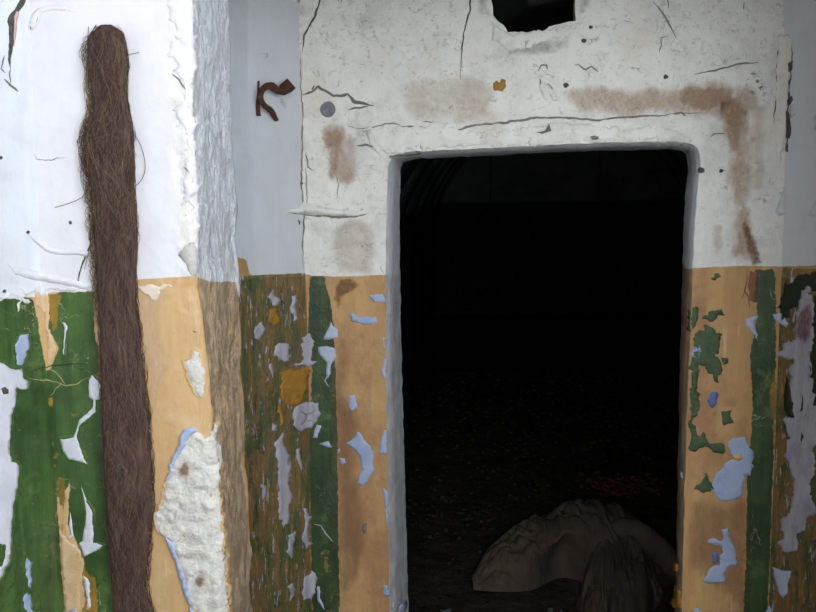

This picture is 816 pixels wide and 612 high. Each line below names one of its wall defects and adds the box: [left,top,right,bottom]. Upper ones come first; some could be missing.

crack [460,0,471,79]
crack [297,0,433,270]
crack [457,112,694,130]
corrosion [738,217,760,264]
peeling [0,332,35,612]
peeling [58,374,101,466]
peeling [269,323,388,559]
peeling [686,307,754,501]
peeling [772,271,816,553]
peeling [59,482,106,612]
peeling [287,571,324,609]
peeling [703,528,737,584]